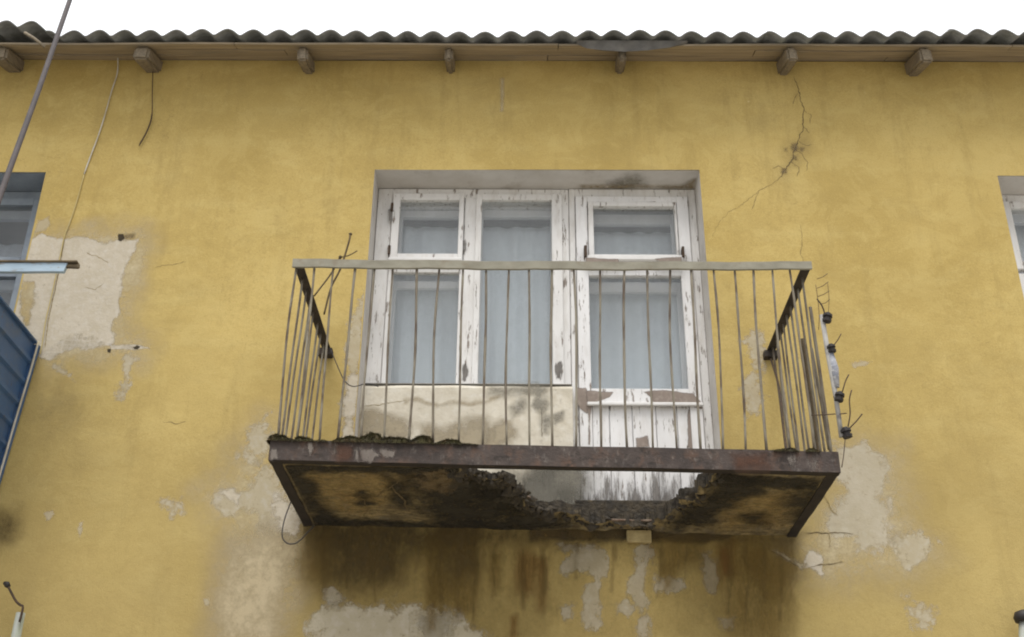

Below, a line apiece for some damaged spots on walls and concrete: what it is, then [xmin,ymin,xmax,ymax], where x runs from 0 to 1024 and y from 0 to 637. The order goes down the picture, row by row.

crack [712,78,812,236]
peeling [15,218,148,401]
water stain [358,410,409,438]
water stain [424,384,563,445]
peeling [577,387,613,445]
peeling [645,390,702,448]
peeling [212,412,302,546]
spalling [414,468,724,531]
peeling [803,440,938,577]
peeling [303,586,486,637]
peeling [557,542,609,632]
peeling [617,544,686,637]